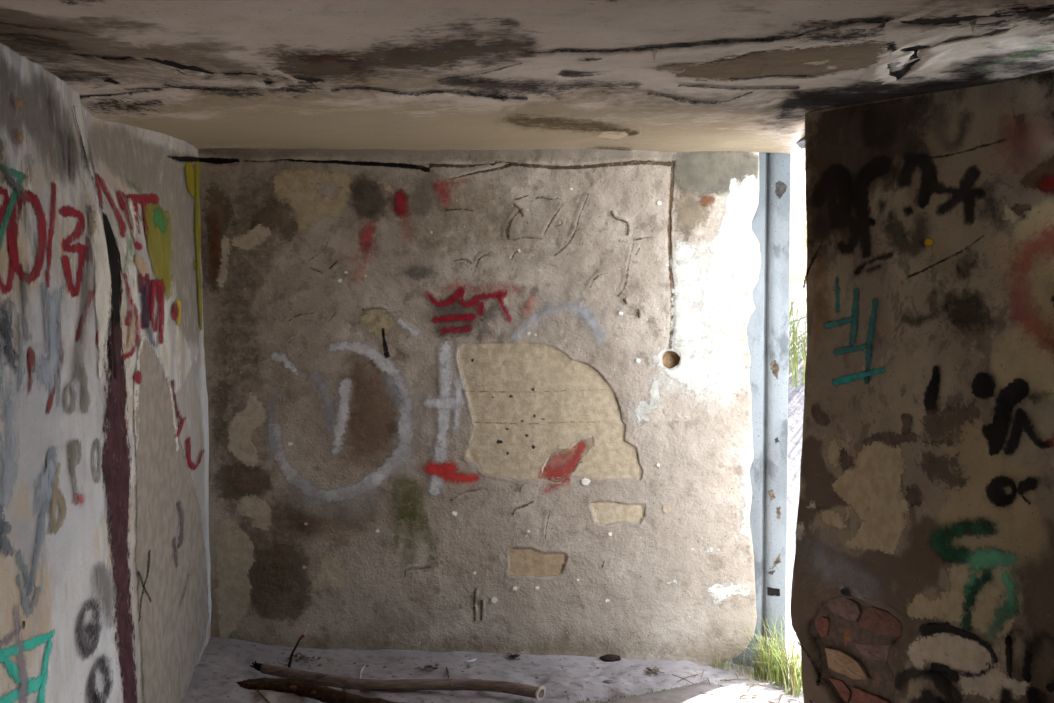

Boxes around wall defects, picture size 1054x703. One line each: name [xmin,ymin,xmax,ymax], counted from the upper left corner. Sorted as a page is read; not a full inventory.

crack [0,0,1054,207]
crack [161,150,677,349]
spalling [454,175,758,544]
water stain [212,381,232,441]
water stain [212,463,271,500]
peeling [807,399,980,555]
water stain [247,543,311,621]
spalling [504,530,580,590]
peeling [706,580,750,606]
peeling [795,522,806,541]
spalling [795,550,1030,703]